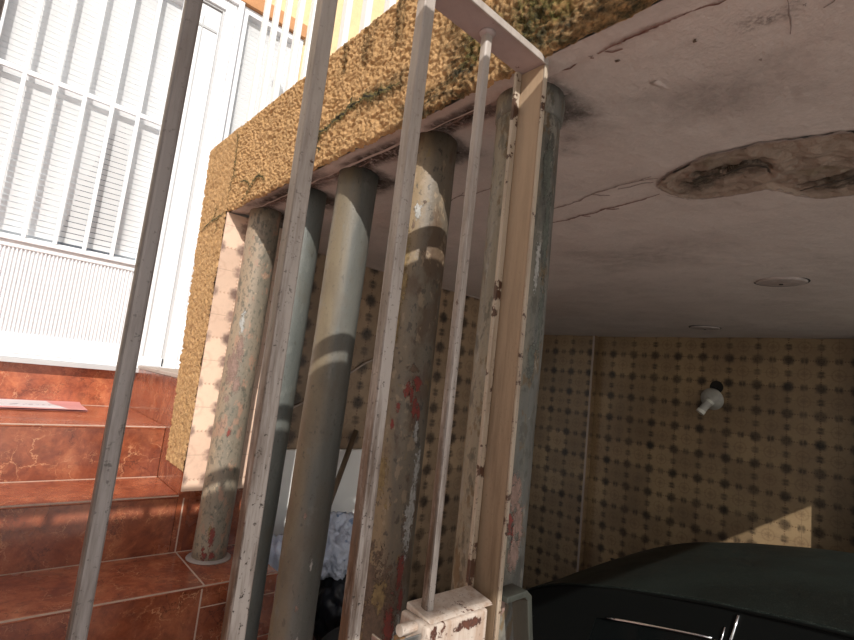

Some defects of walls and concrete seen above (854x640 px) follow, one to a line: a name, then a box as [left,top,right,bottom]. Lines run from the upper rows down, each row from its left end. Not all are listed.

crack [562,0,726,71]
damp [422,36,491,162]
damp [259,189,289,222]
damp [346,144,400,189]
crack [553,177,659,223]
spalling [656,131,854,200]
peeling [394,200,427,352]
peeling [361,364,423,640]